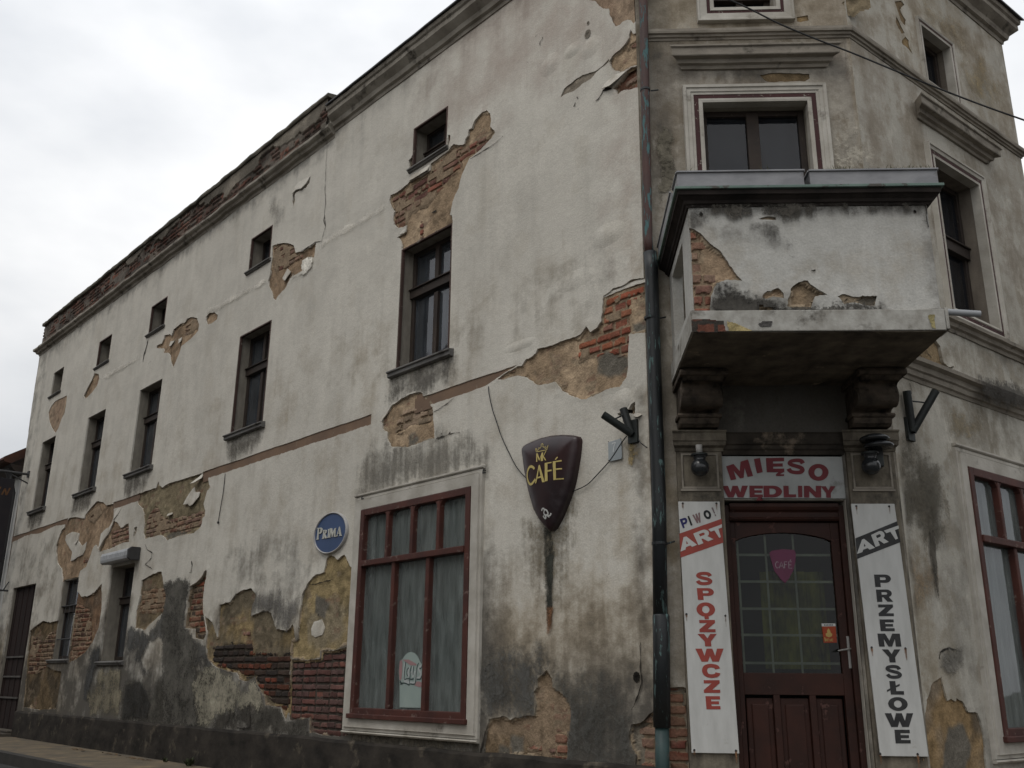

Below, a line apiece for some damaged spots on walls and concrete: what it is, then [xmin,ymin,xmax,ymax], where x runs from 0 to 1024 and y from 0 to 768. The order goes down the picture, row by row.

peeling [562,0,637,96]
crack [303,143,327,250]
flaking render [390,111,495,249]
flaking render [269,243,316,300]
flaking render [690,229,824,332]
flaking render [157,313,218,366]
flaking render [501,279,646,399]
flaking render [57,473,210,582]
water stain [530,506,573,633]
water stain [120,579,309,736]
flaking render [186,555,351,736]
peeling [923,678,985,768]